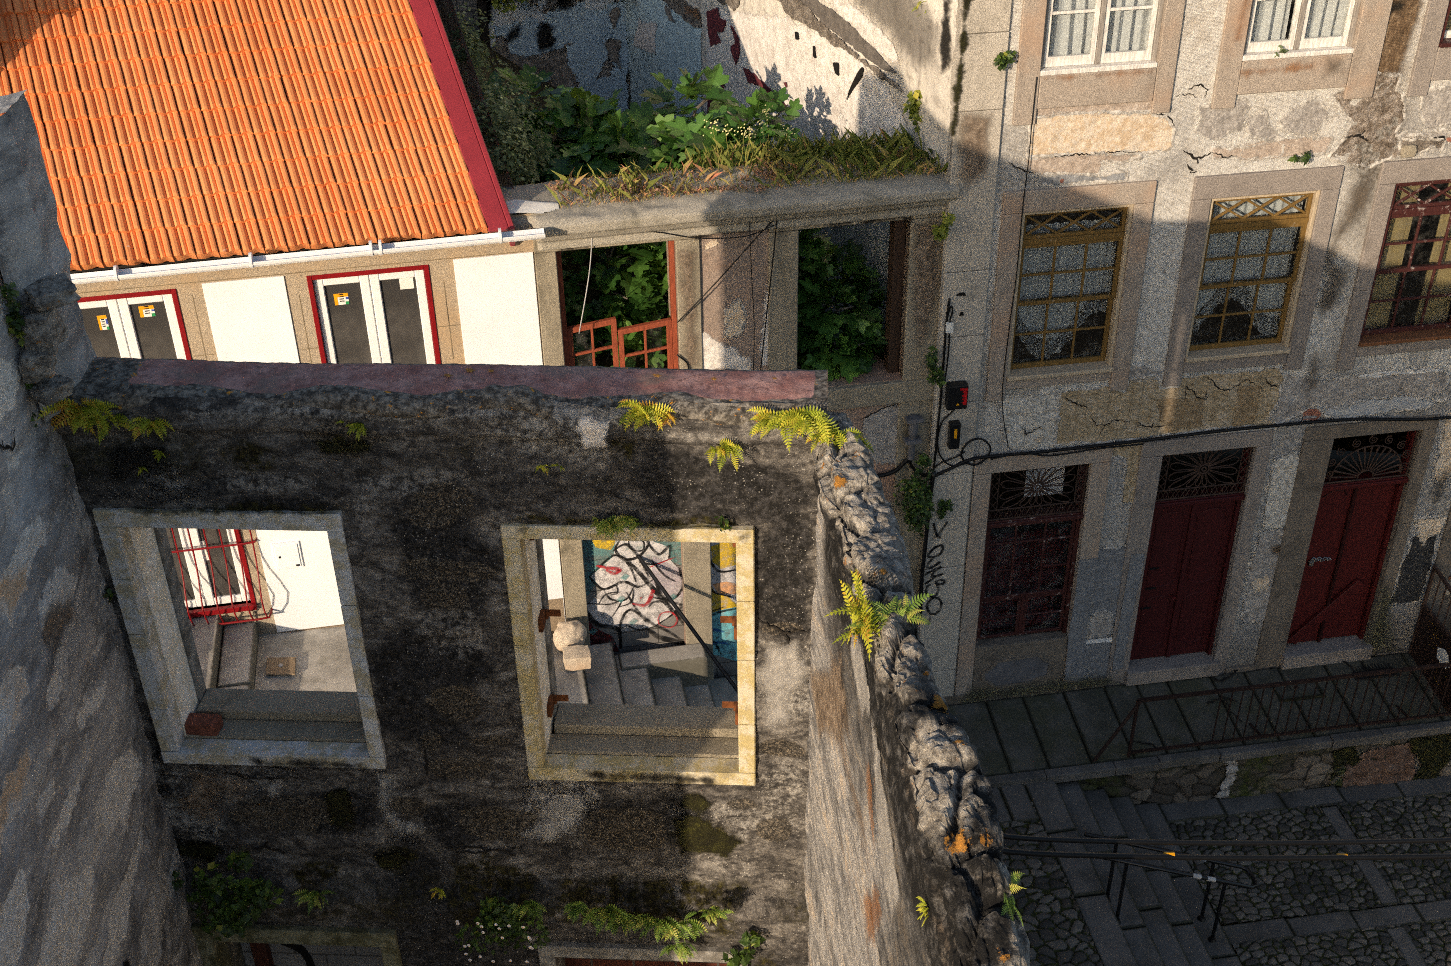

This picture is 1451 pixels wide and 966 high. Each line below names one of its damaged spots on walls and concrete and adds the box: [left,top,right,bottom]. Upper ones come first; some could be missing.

peeling [488,0,910,145]
crack [1010,151,1139,173]
spalling [1024,101,1176,187]
crack [1157,83,1235,173]
spalling [1194,72,1451,168]
crack [1066,398,1163,434]
peeling [999,363,1451,503]
crack [1185,377,1277,400]